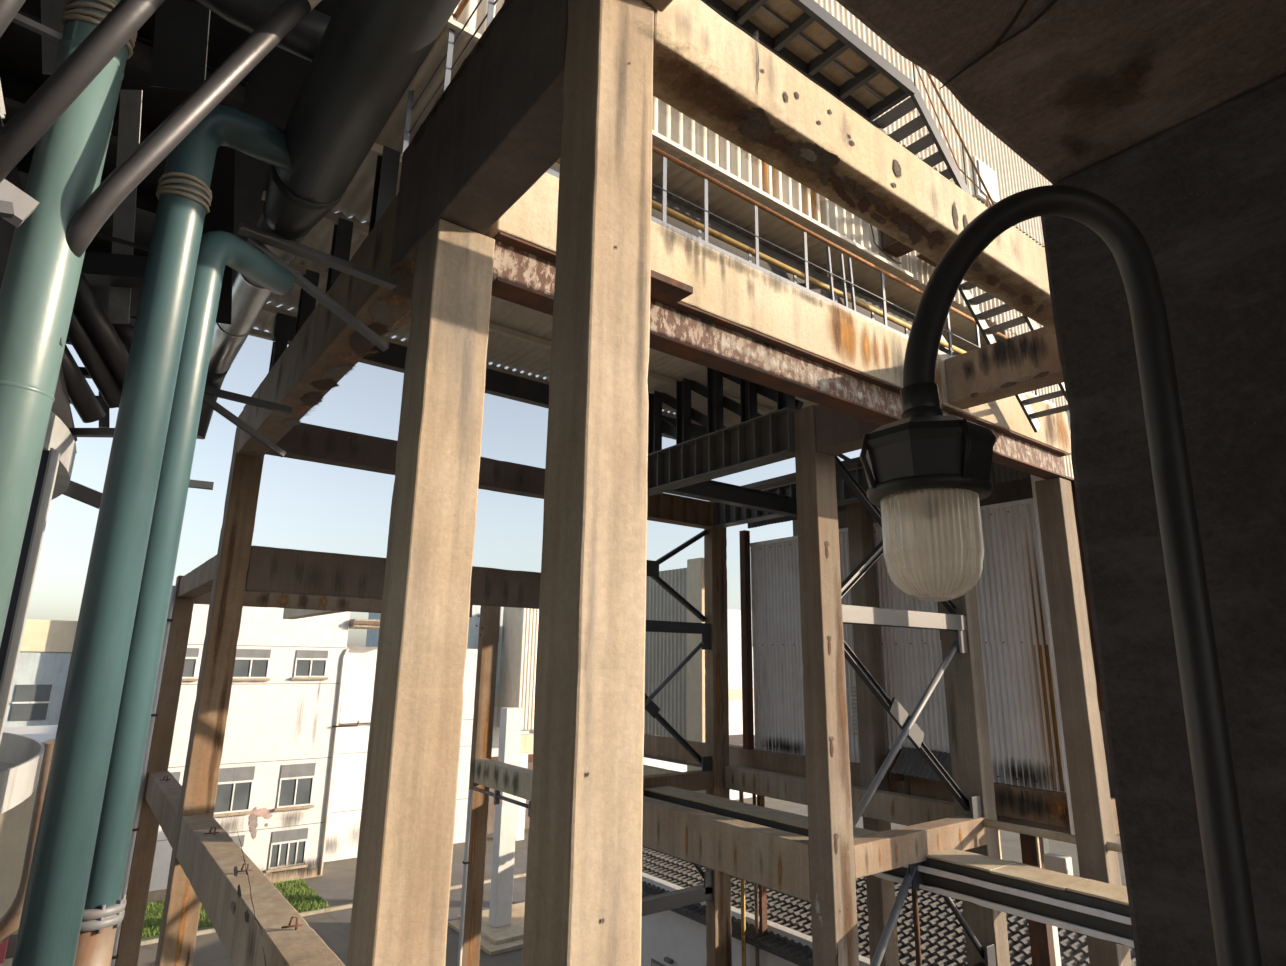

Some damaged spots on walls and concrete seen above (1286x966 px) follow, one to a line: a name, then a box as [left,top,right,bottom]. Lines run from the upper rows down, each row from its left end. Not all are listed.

rust [673,307,713,328]
rust [833,316,888,365]
leakage [965,259,1054,375]
crack [237,832,266,966]